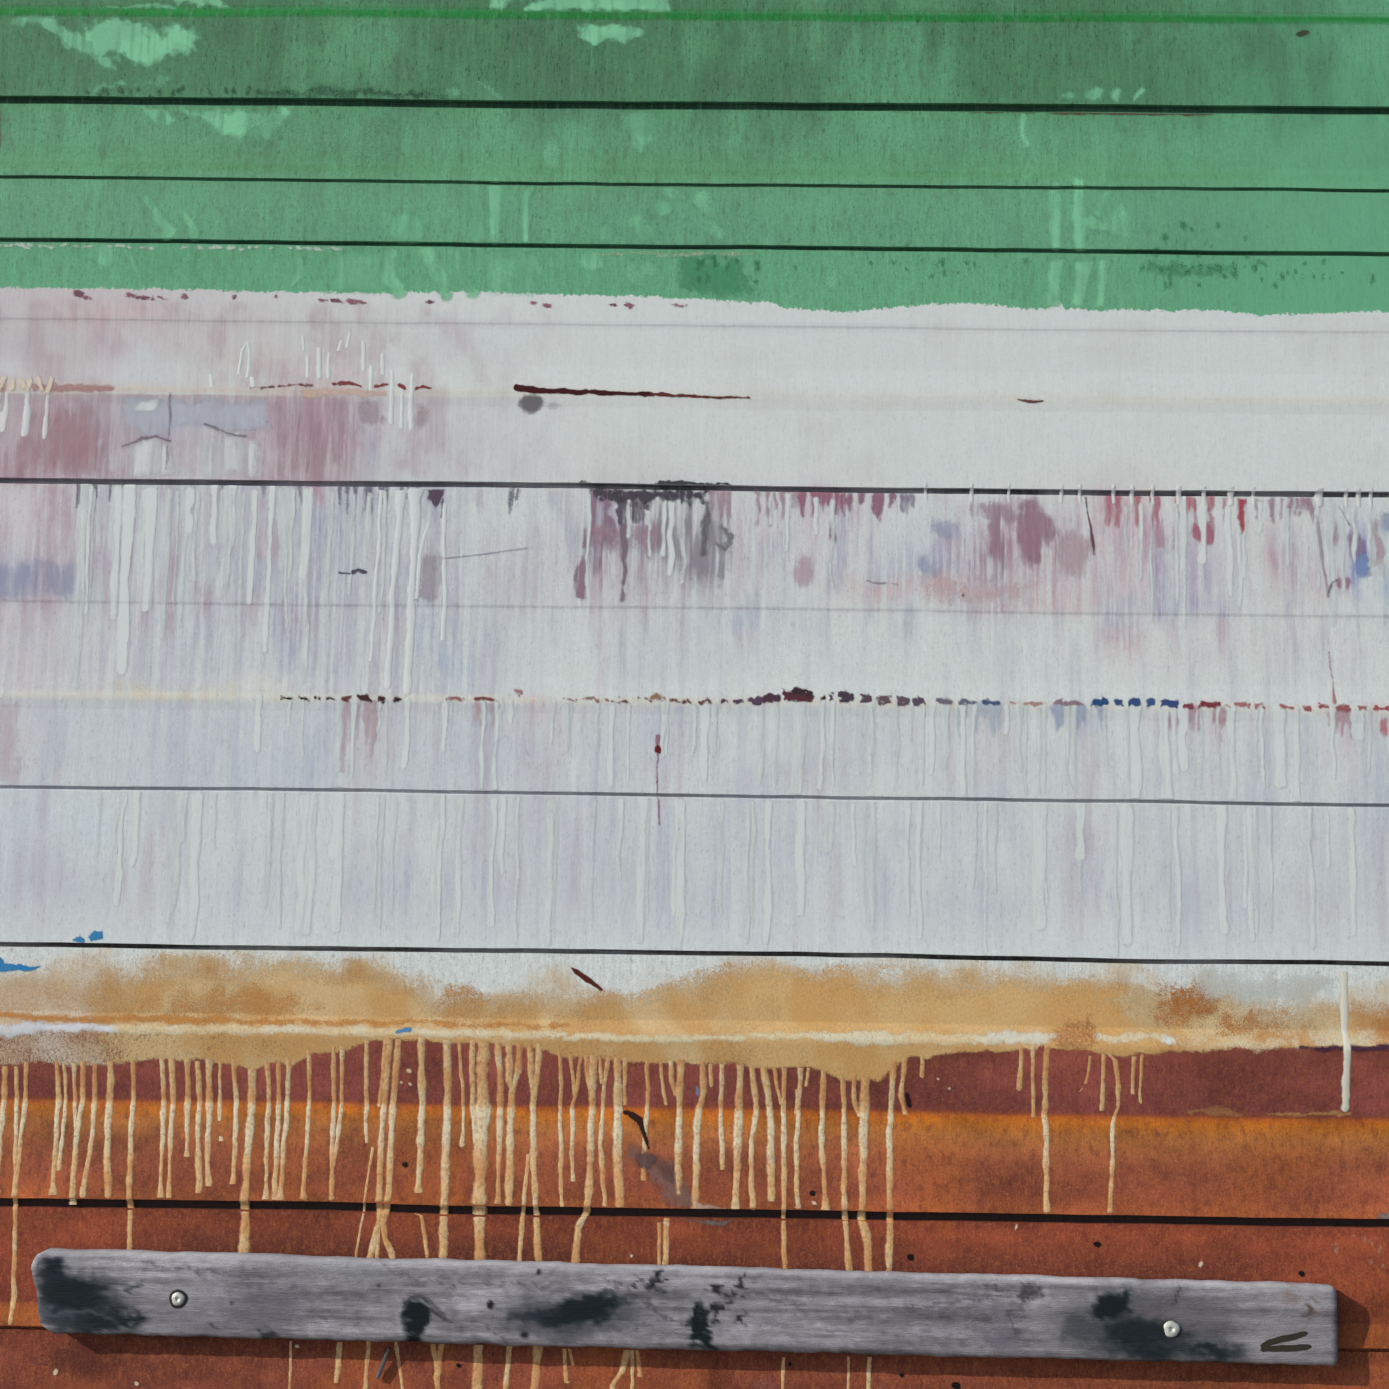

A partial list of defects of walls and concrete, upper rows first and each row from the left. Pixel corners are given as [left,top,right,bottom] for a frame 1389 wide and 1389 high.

water stain [517,394,561,414]
water stain [69,332,448,942]
water stain [471,694,522,943]
water stain [669,798,687,950]
water stain [742,696,877,944]
water stain [573,480,1097,610]
water stain [893,695,1109,956]
water stain [1113,699,1274,959]
water stain [1253,702,1357,950]
water stain [1326,701,1389,781]
rust [0,979,570,1037]
rust [1147,974,1389,1053]